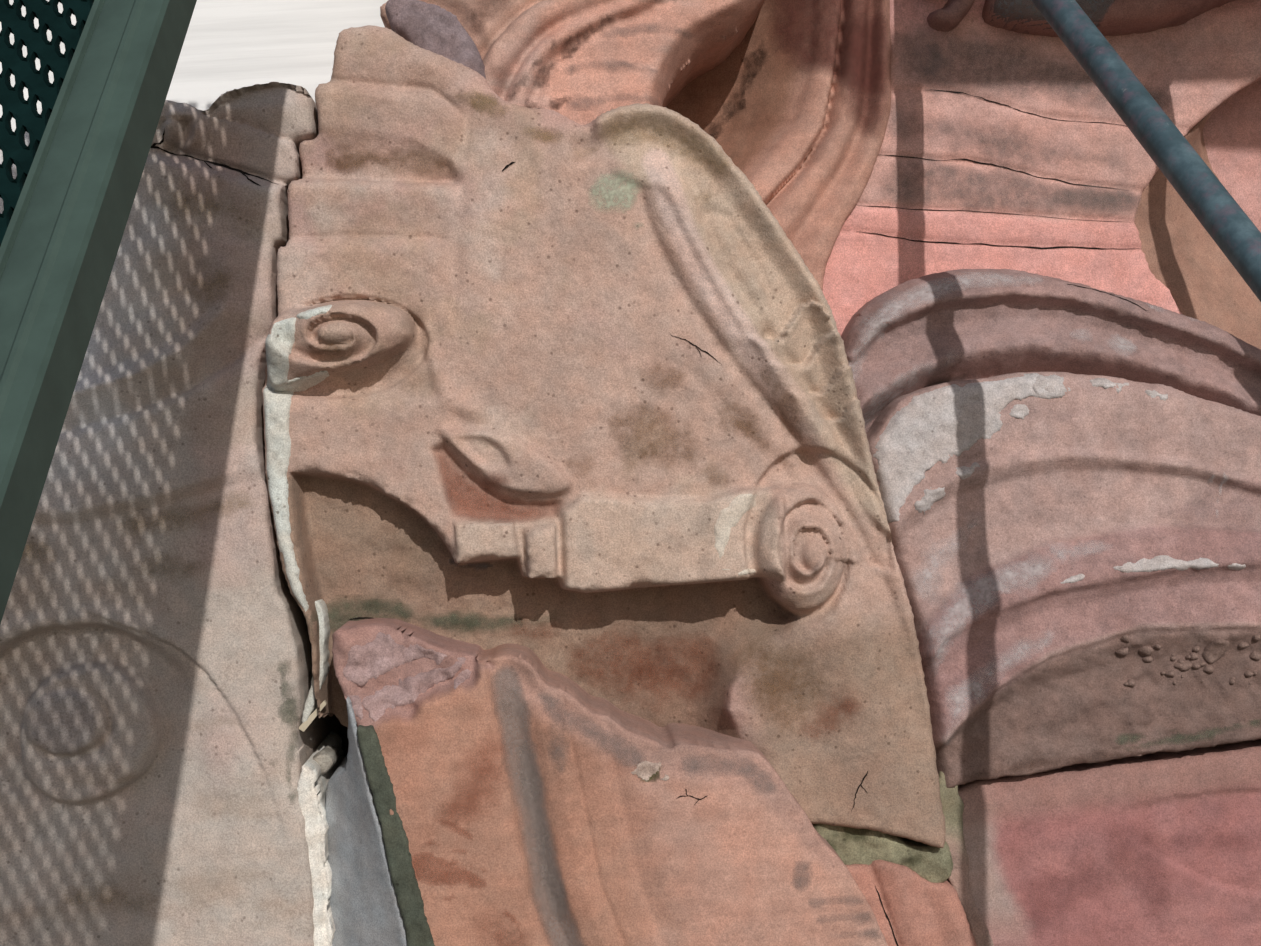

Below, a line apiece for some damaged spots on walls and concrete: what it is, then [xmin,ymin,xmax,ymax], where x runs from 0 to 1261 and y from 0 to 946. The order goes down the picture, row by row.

crack [934,90,1125,126]
crack [151,128,276,186]
crack [885,155,1128,191]
crack [857,205,1138,249]
crack [1068,284,1148,311]
peeling [1090,378,1129,393]
peeling [873,373,1071,523]
peeling [1061,574,1085,584]
peeling [1113,555,1246,573]
spalling [1115,634,1261,685]
spalling [313,745,339,775]
spalling [332,618,888,946]